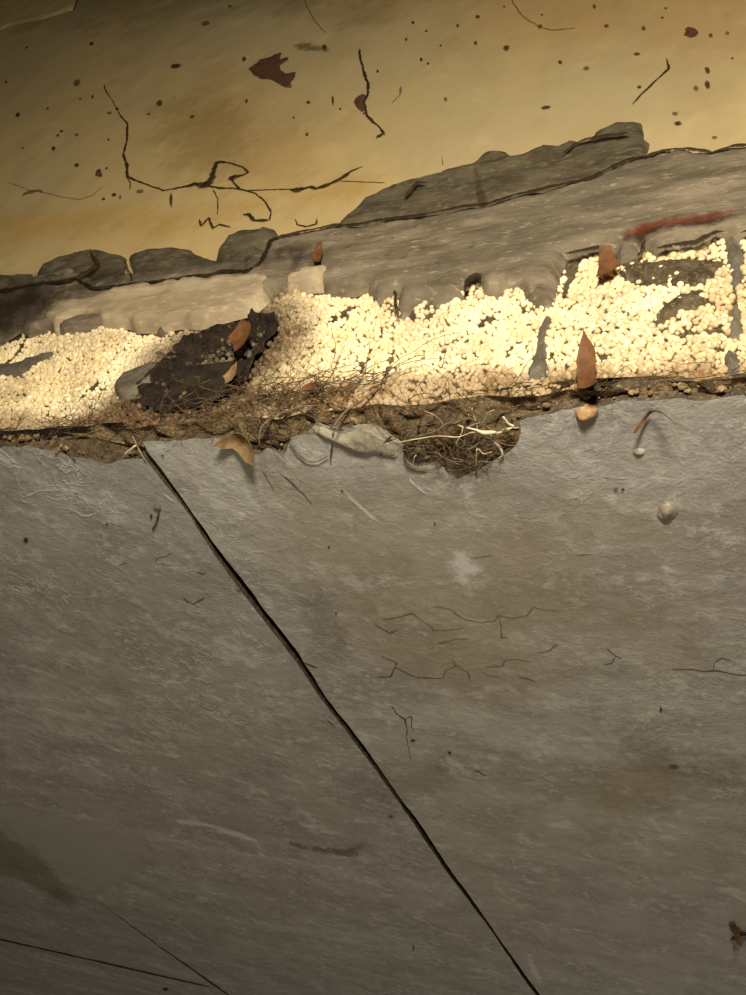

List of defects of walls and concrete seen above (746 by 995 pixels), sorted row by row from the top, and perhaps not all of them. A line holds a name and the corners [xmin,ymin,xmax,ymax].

crack [358,49,385,138]
crack [632,58,670,104]
crack [7,85,746,291]
spalling [0,238,746,487]
crack [263,472,313,506]
crack [374,606,560,682]
crack [392,707,414,759]